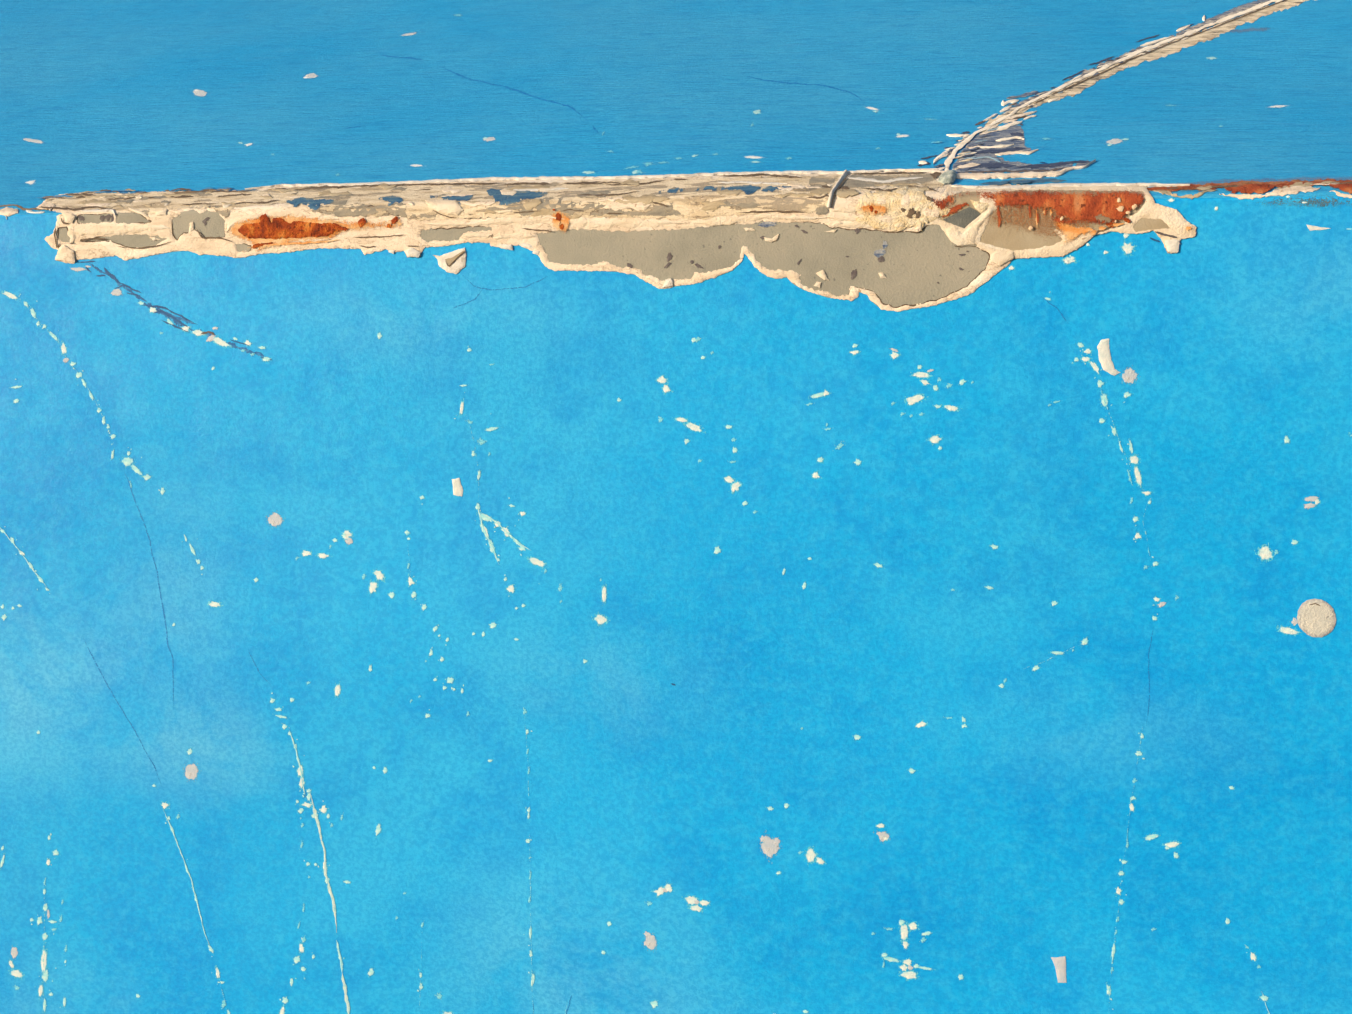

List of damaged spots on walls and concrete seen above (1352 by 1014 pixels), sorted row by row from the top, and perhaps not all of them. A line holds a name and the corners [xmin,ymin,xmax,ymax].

rust [229,214,403,251]
peeling [0,0,1309,312]
rust [933,176,1352,243]
peeling [1,290,166,496]
peeling [1074,339,1152,540]
peeling [1276,599,1336,637]